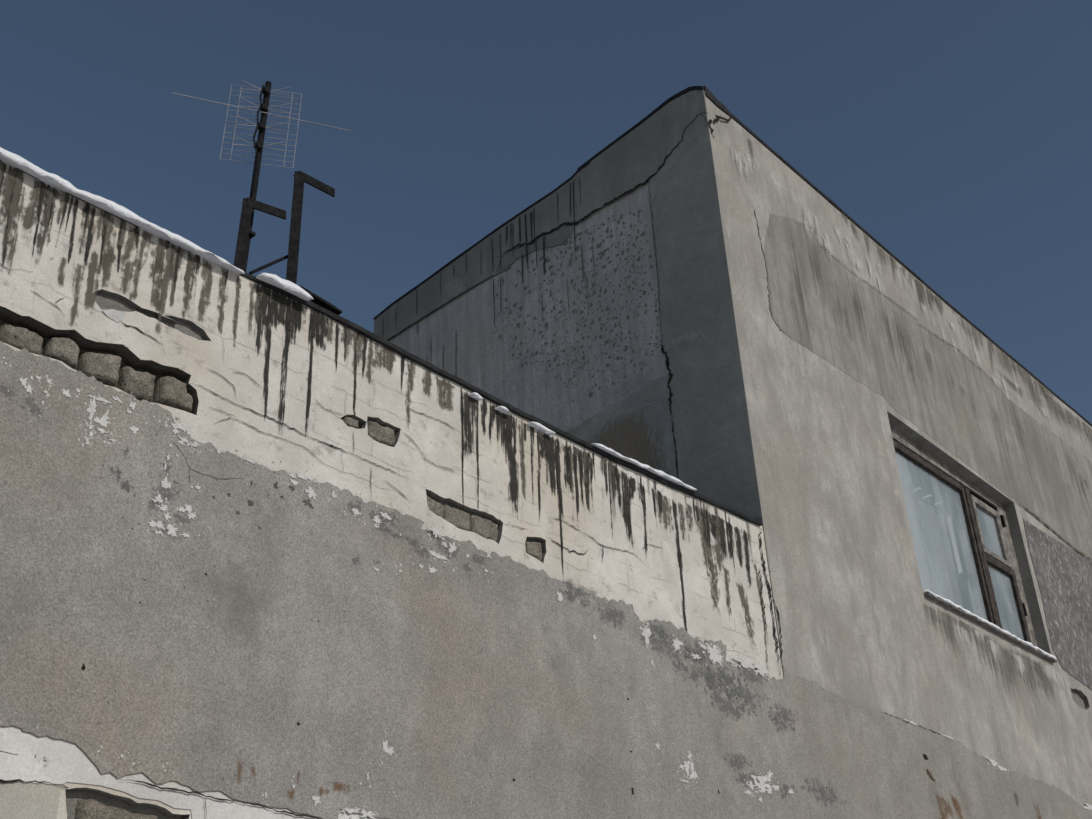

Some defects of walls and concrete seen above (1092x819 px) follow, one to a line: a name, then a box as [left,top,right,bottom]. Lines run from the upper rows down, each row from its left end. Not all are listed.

spalling [94,289,211,341]
crack [388,112,719,479]
water stain [804,212,954,313]
spalling [0,306,231,542]
spalling [341,414,401,447]
water stain [0,159,767,661]
water stain [942,322,1092,439]
spalling [273,458,503,582]
peeling [0,726,321,819]
peeling [338,804,391,819]
peeling [360,732,402,787]